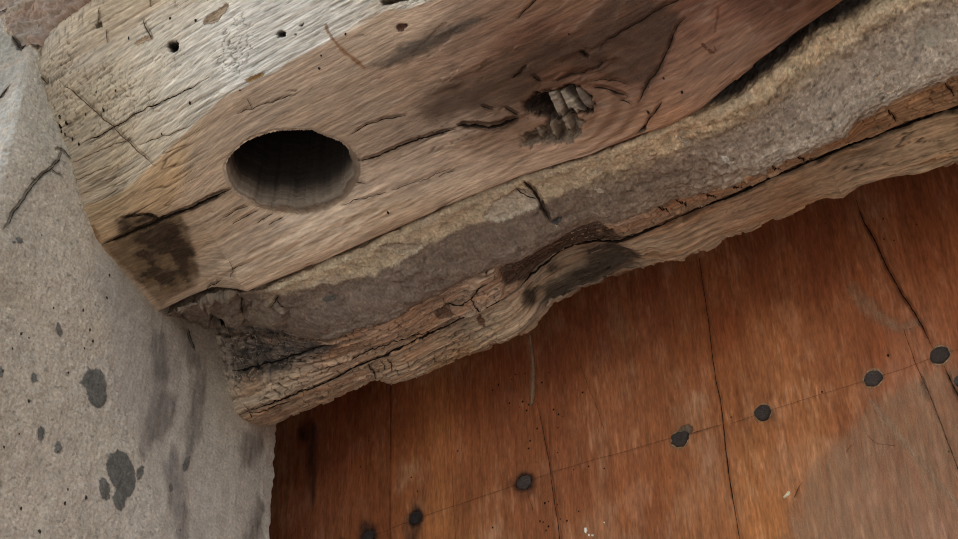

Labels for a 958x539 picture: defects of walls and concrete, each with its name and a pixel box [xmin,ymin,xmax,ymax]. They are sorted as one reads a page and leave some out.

crack [4,77,209,229]
spalling [522,84,594,149]
leakage [108,216,197,300]
leakage [502,221,640,306]
leakage [80,368,107,408]
leakage [99,449,144,511]
leakage [169,437,193,534]